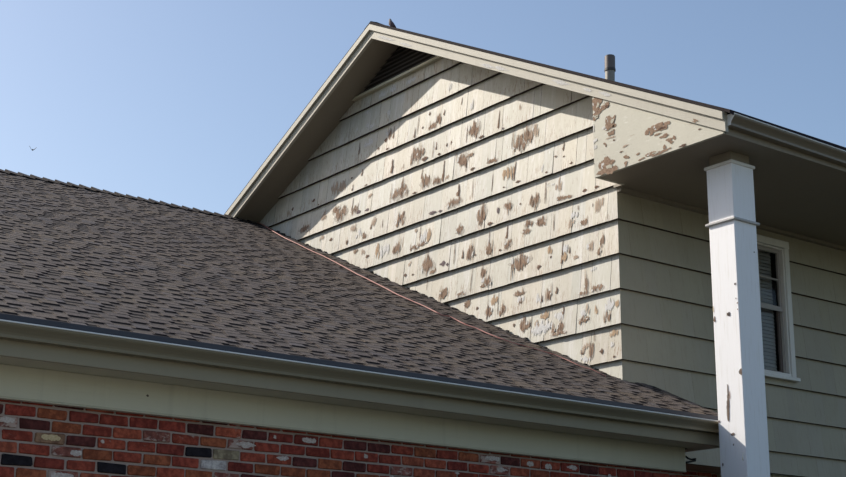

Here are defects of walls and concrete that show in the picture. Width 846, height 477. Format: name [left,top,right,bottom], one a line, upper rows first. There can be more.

peeling [467,119,484,139]
peeling [511,123,539,152]
peeling [592,97,686,175]
peeling [410,141,452,164]
peeling [312,198,380,258]
peeling [389,174,441,203]
peeling [476,203,493,226]
peeling [503,192,540,214]
peeling [522,216,547,237]
peeling [466,239,512,261]
peeling [509,252,541,281]
peeling [439,287,506,320]